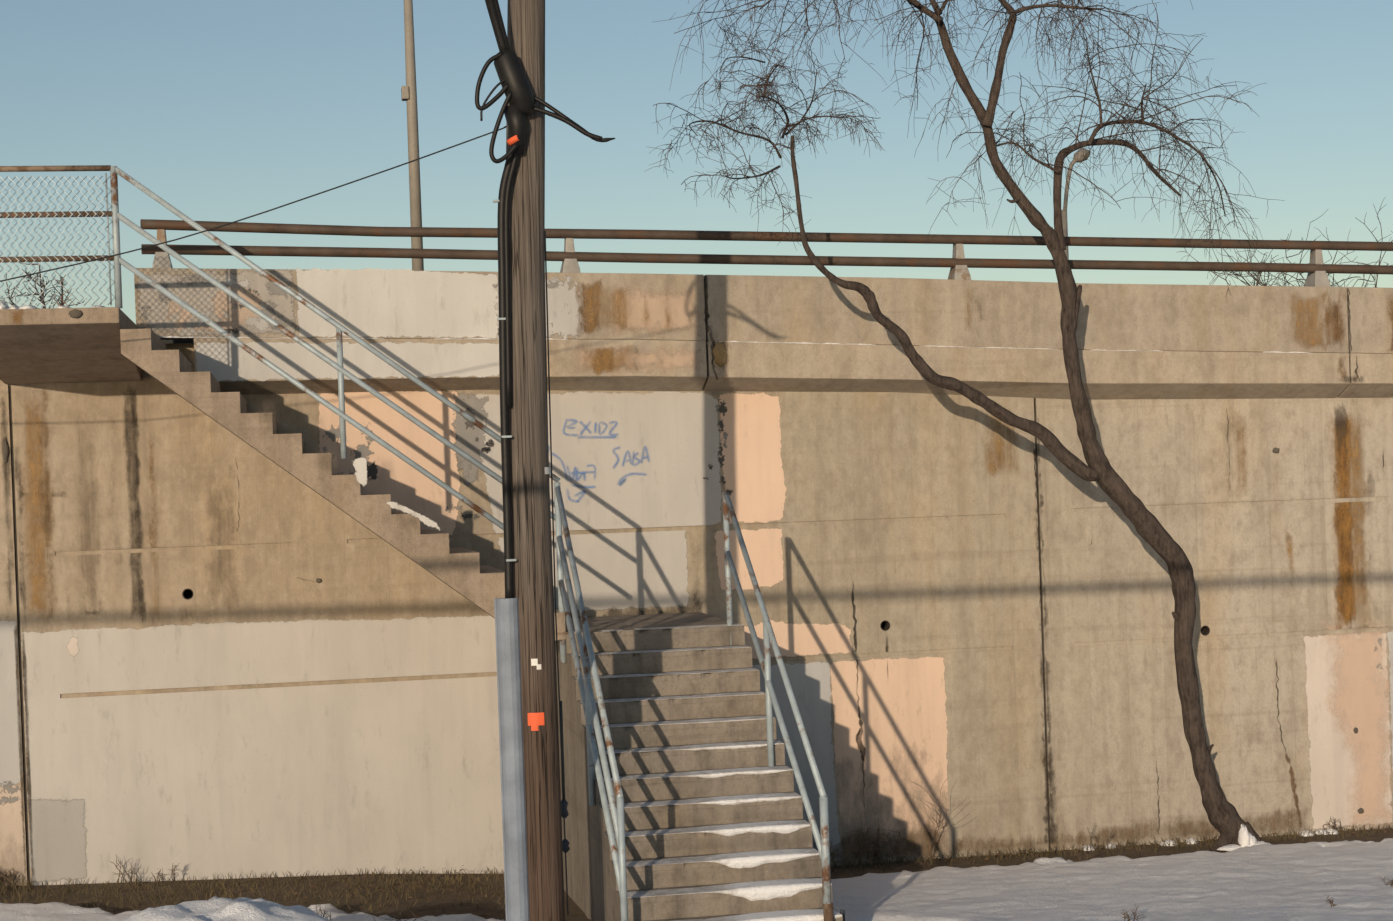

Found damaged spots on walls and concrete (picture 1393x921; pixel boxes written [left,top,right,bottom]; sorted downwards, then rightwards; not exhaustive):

peeling [136,269,296,338]
peeling [545,276,588,339]
rust [577,284,626,331]
rust [592,350,623,372]
rust [1293,299,1343,346]
peeling [452,392,489,487]
rust [27,407,50,609]
damp [125,397,142,612]
rust [1335,412,1366,619]
crack [852,585,866,808]
crack [1276,662,1300,815]